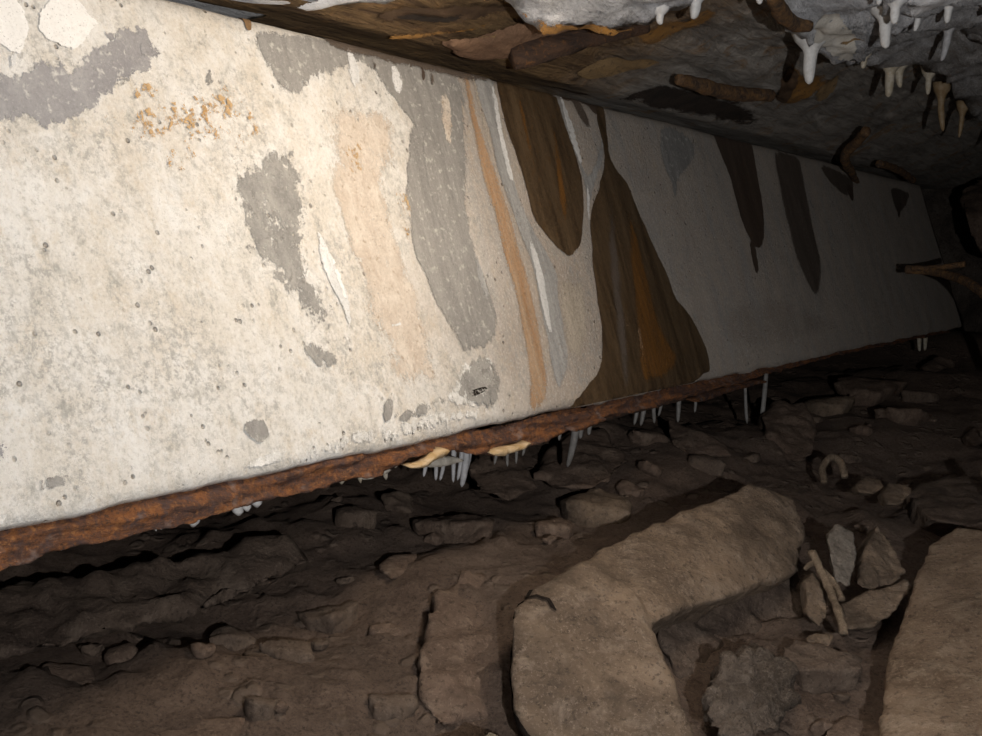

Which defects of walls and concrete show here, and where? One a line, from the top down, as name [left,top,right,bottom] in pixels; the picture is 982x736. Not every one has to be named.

damp [0,0,99,67]
damp [234,0,361,11]
spalling [195,0,982,227]
peeling [232,146,339,331]
peeling [304,342,338,370]
damp [308,123,500,458]
corrosion [464,74,548,410]
damp [318,37,710,408]
damp [711,134,764,273]
damp [775,150,822,293]
corrosion [401,446,464,468]
corrosion [487,440,531,456]